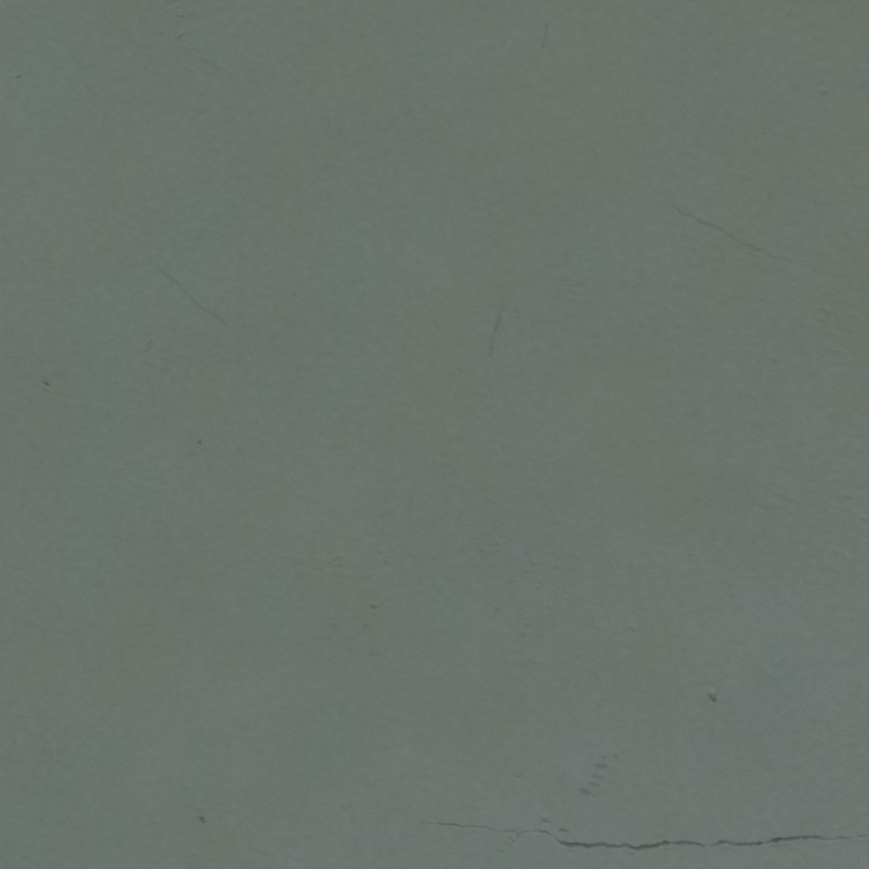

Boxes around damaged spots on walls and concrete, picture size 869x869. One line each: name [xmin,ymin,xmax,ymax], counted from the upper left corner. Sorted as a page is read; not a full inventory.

crack [406,812,869,859]